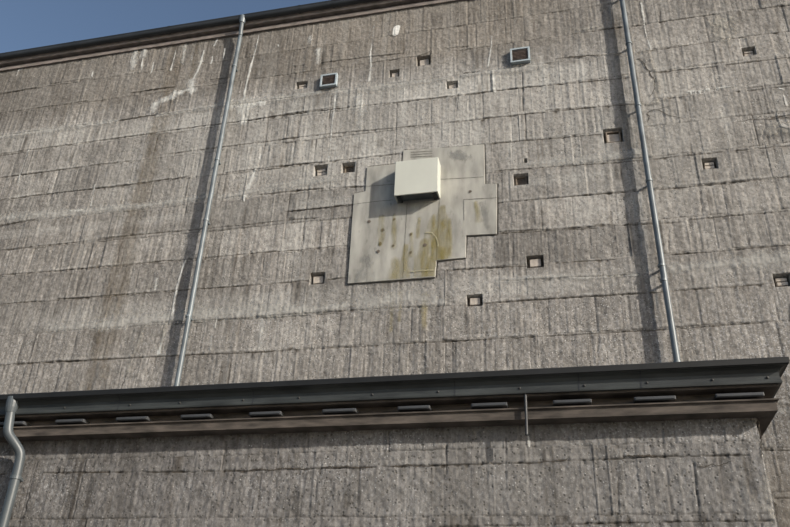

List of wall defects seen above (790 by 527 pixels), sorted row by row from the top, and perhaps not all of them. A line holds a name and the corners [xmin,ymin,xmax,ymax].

leakage [130,49,154,74]
leakage [151,38,235,113]
crack [640,60,680,122]